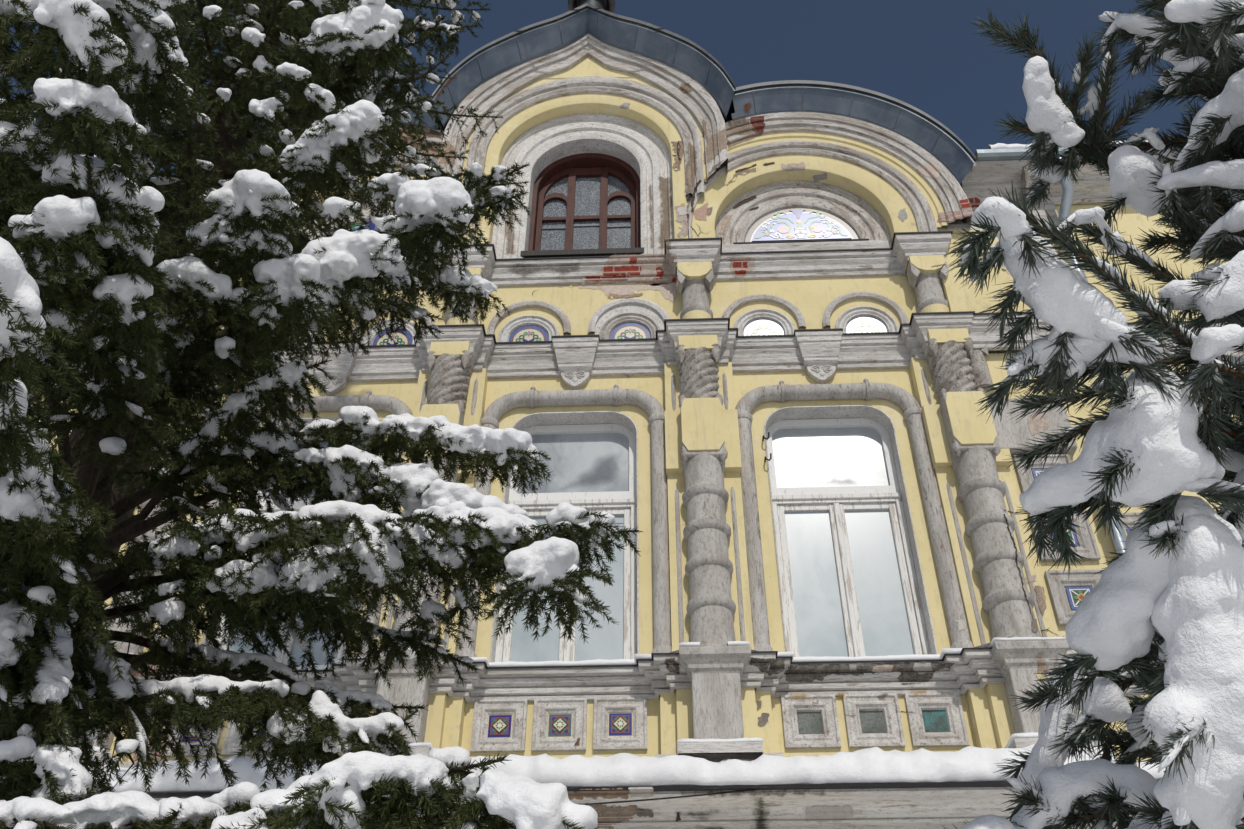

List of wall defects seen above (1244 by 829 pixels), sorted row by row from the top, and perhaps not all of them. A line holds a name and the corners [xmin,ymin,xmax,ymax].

flaking render [377,34,981,238]
flaking render [558,253,679,302]
flaking render [729,256,755,278]
water stain [676,811,723,829]